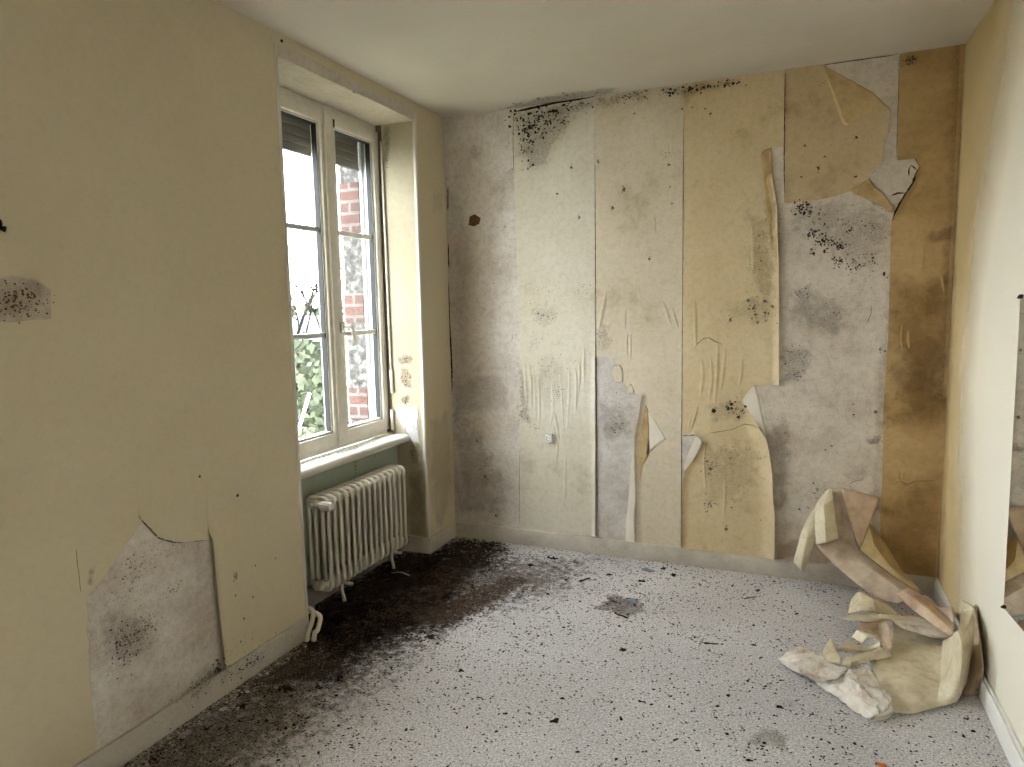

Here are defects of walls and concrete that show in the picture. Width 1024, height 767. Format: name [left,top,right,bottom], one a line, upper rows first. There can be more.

mould [504,87,647,170]
mould [794,199,888,280]
damp [0,279,55,324]
flaking render [756,54,919,558]
flaking render [592,352,641,541]
flaking render [809,539,831,562]
flaking render [86,524,224,750]